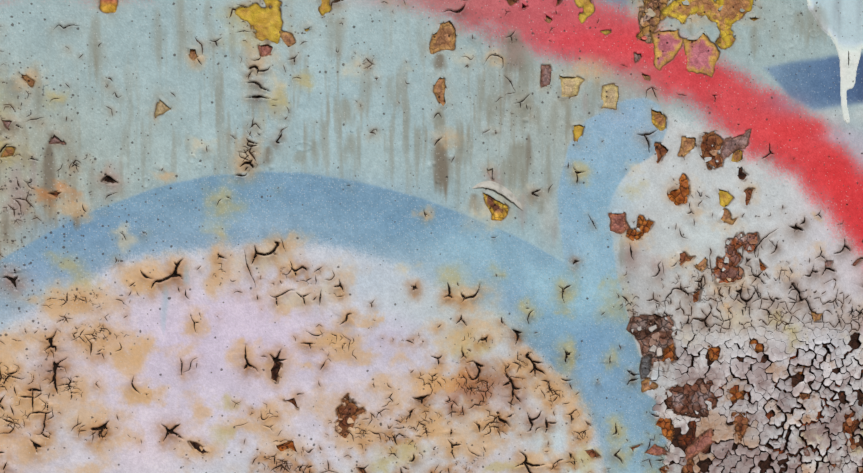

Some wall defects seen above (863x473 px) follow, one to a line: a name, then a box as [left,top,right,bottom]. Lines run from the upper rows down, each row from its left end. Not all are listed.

crack [57,154,118,198]
crack [187,4,307,176]
crack [0,180,593,473]
corrosion [0,134,841,473]
corrosion [423,123,471,156]
corrosion [450,22,530,74]
peeling [608,209,654,241]
peeling [626,310,717,473]
peeling [634,0,759,81]
peeling [652,129,767,287]
crack [601,204,863,473]
corrosion [847,292,863,336]